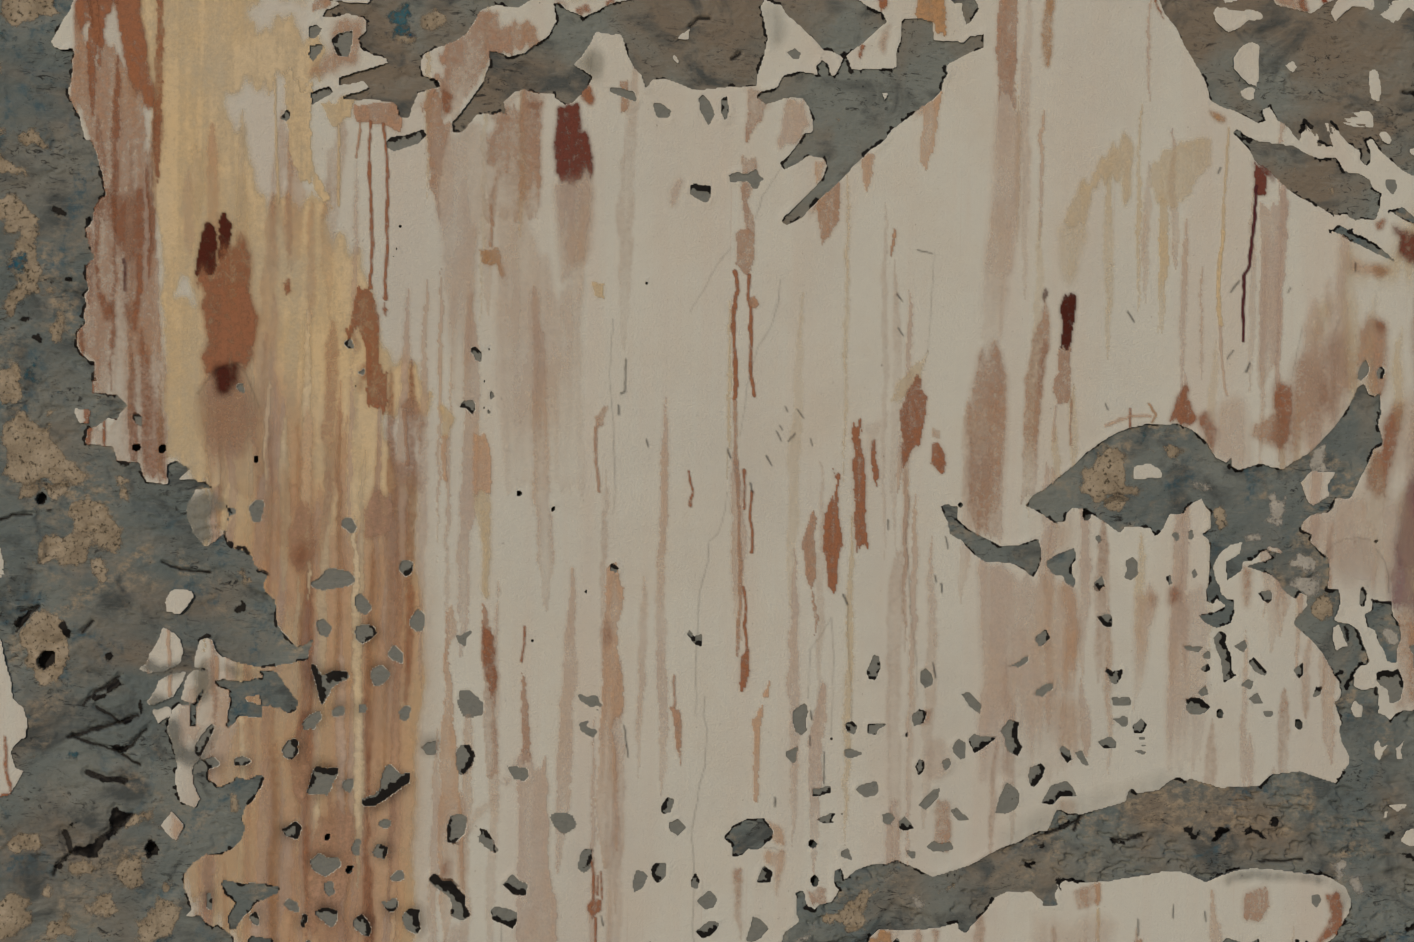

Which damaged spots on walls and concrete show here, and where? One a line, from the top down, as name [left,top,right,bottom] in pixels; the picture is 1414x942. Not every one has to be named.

rust [75,0,164,351]
flaking render [308,0,530,151]
rust [488,86,594,250]
flaking render [452,0,983,225]
flaking render [1159,0,1414,262]
flaking render [0,0,411,942]
rust [195,213,258,454]
rust [731,182,759,692]
rust [802,418,879,629]
rust [1024,291,1076,443]
flaking render [746,360,1414,942]
flaking render [724,818,772,856]